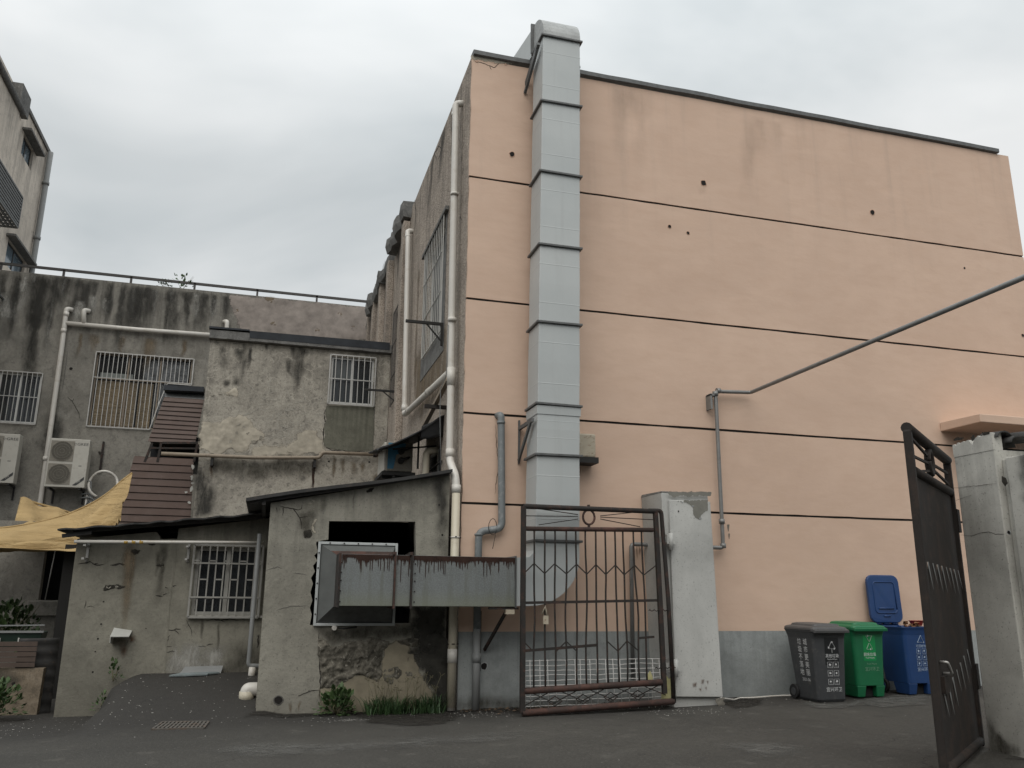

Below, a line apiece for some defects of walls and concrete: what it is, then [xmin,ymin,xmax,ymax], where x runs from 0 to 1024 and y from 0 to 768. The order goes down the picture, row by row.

damp [0,275,228,347]
peeling [668,491,711,519]
corrosion [332,551,515,582]
spalling [317,638,420,689]